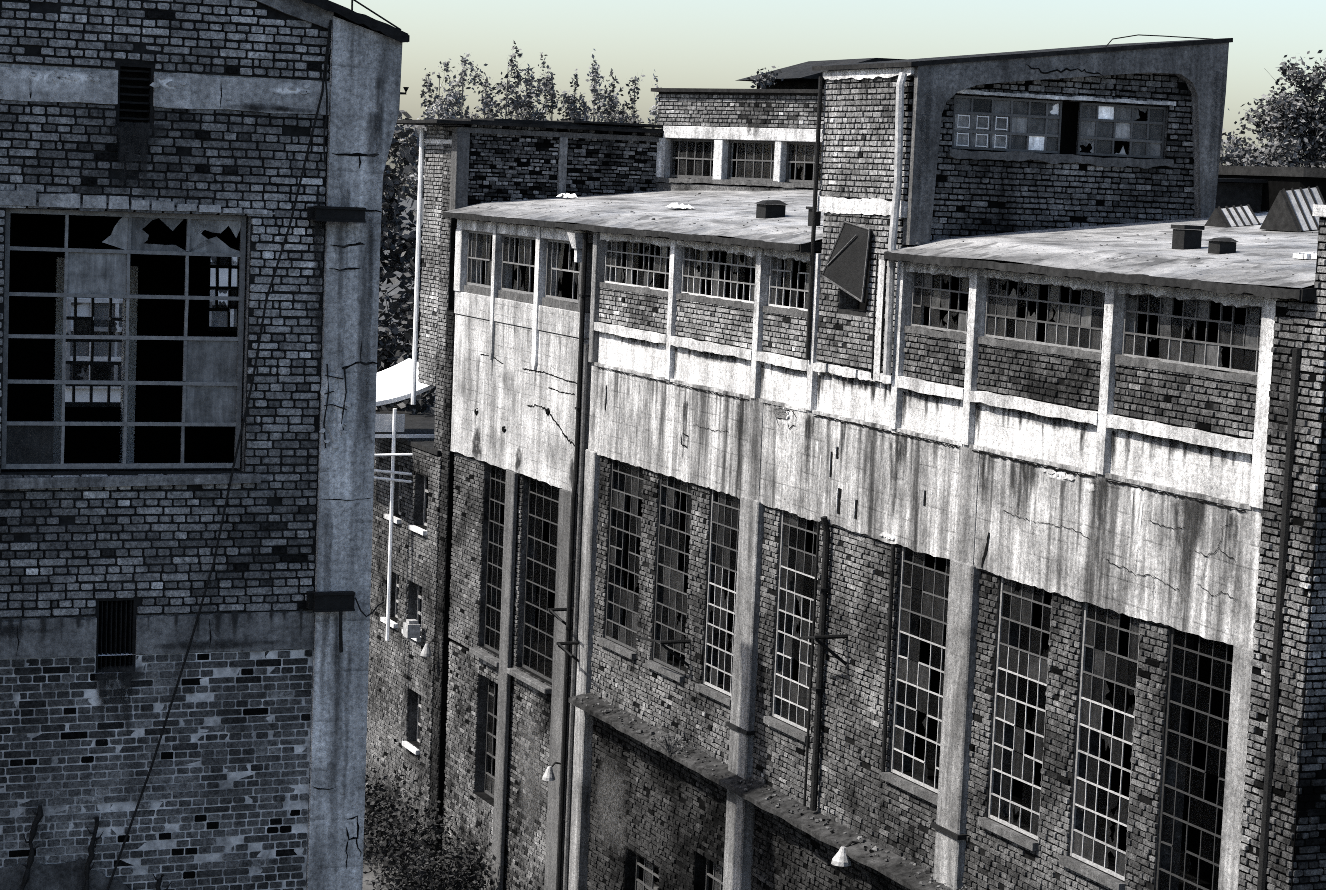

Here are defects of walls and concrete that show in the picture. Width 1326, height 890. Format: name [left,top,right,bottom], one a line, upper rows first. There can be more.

crack [332,153,379,169]
crack [329,210,383,271]
crack [342,342,378,369]
leakage [675,348,1088,480]
crack [480,354,1246,616]
leakage [1011,462,1038,514]
leakage [1060,471,1114,557]
leakage [1131,487,1142,523]
leakage [1161,494,1204,571]